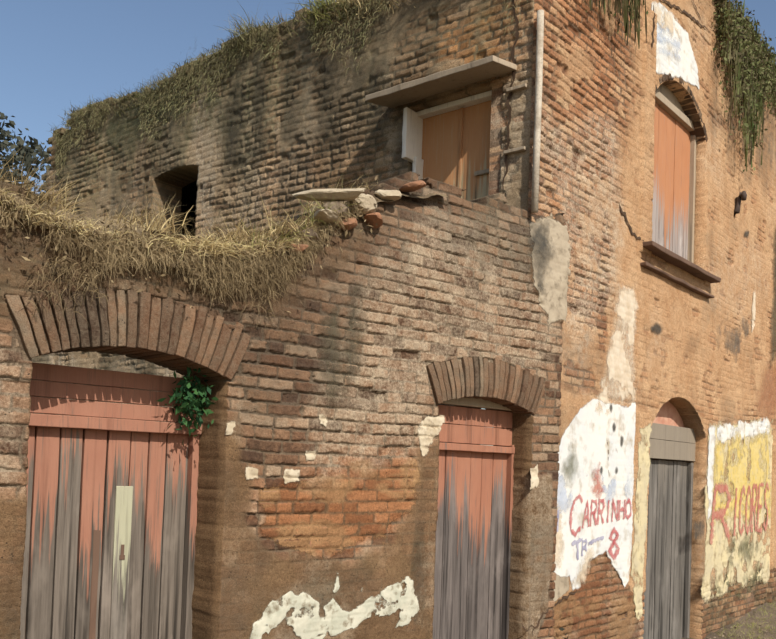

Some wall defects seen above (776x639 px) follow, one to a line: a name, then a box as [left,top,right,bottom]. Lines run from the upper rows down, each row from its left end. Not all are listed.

crack [502,0,519,190]
peeling [652,2,700,89]
crack [619,204,644,241]
peeling [245,467,258,480]
spalling [258,415,445,560]
peeling [553,399,652,639]
peeling [694,418,773,602]
peeling [250,573,419,639]